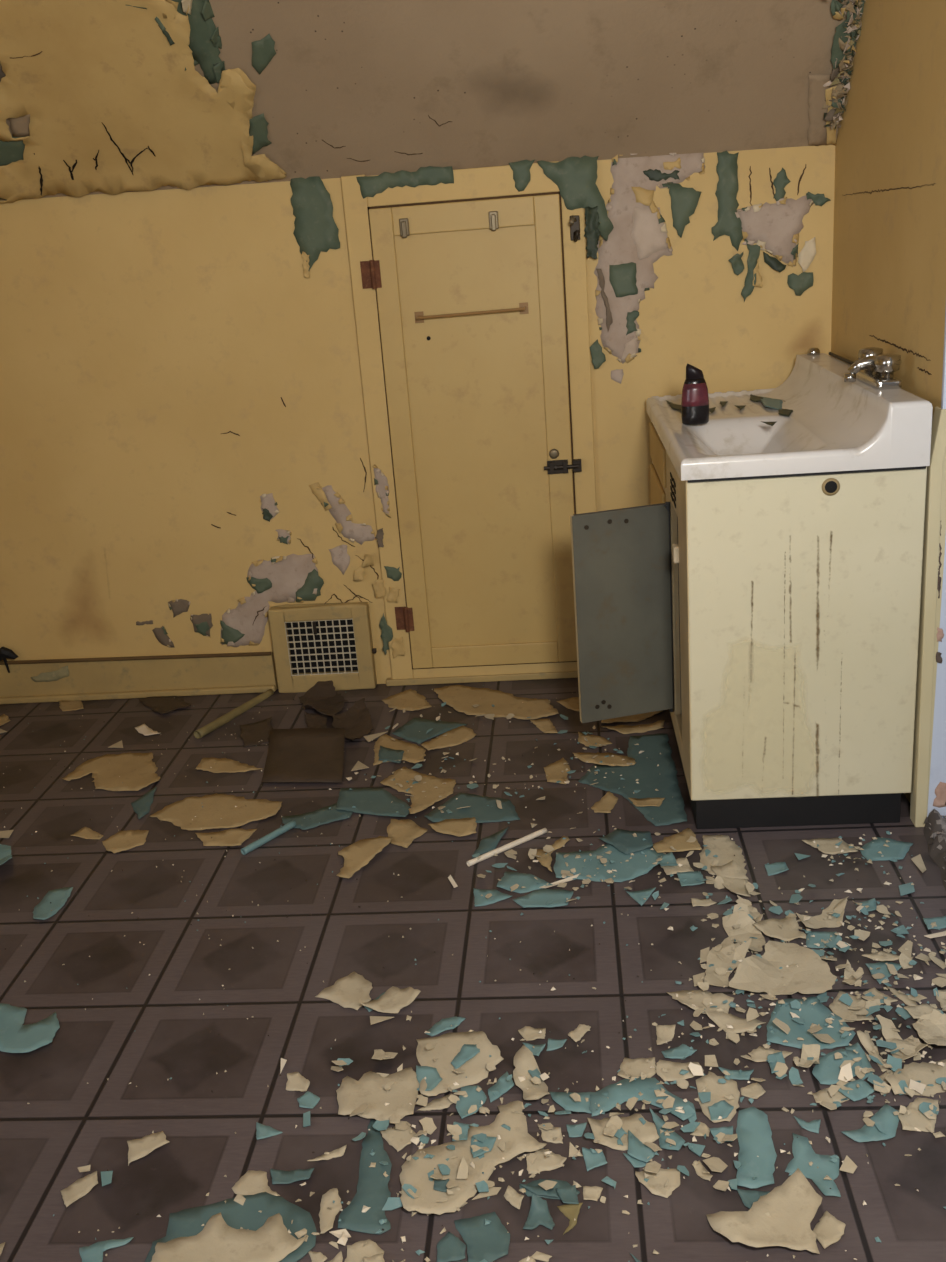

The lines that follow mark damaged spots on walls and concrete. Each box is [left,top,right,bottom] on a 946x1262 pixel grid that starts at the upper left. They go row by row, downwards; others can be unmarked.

peeling [0,0,340,279]
peeling [808,0,866,146]
flaking render [509,150,831,384]
flaking render [136,464,405,659]